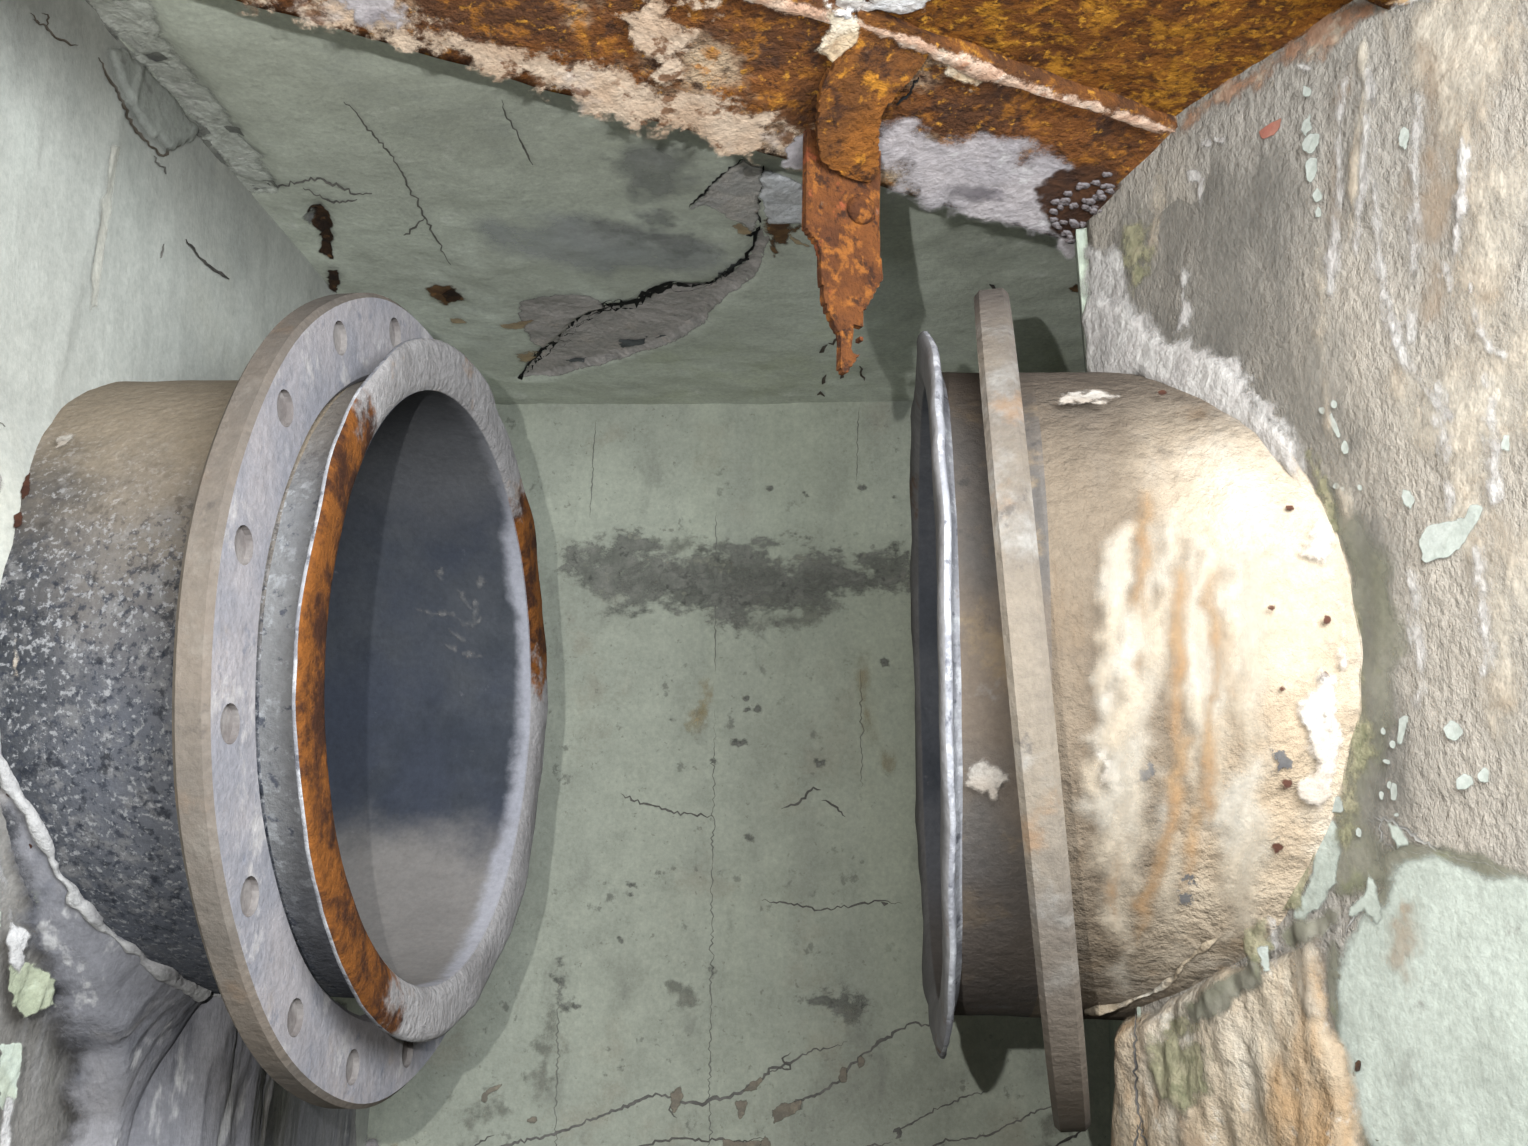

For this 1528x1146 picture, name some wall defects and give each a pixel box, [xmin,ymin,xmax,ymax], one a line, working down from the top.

spalling [85,0,278,193]
rust [1183,4,1374,130]
crack [276,104,451,265]
crack [161,239,229,279]
rust [426,285,466,323]
crack [518,159,765,380]
rust [764,218,809,257]
crack [589,422,597,512]
leakage [560,529,910,630]
crack [711,606,719,670]
crack [474,712,954,1146]
crack [867,1090,1080,1146]